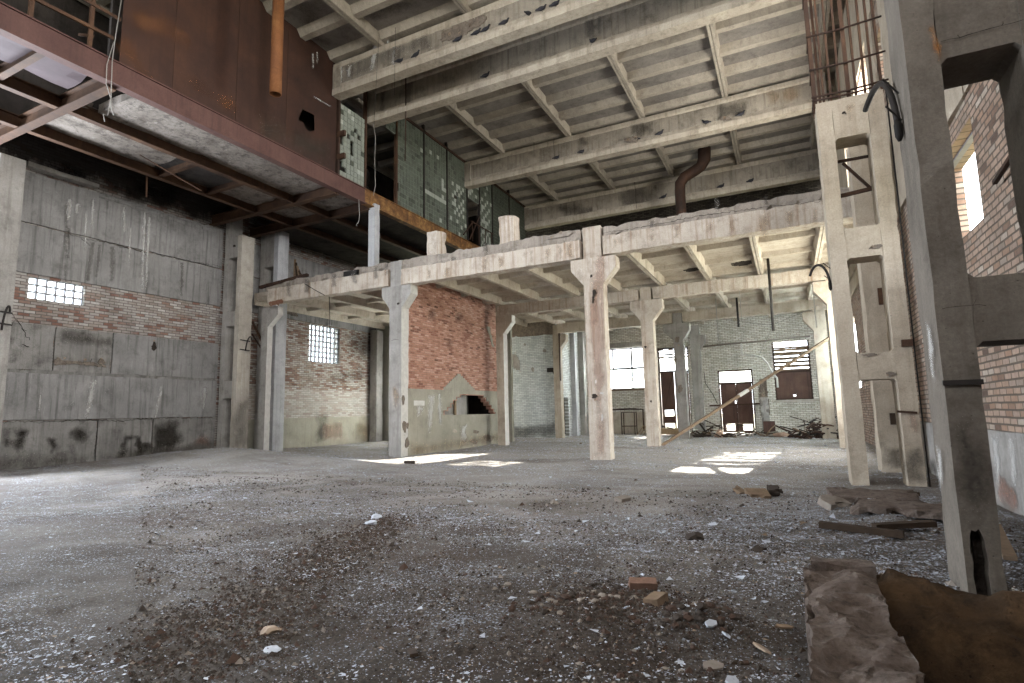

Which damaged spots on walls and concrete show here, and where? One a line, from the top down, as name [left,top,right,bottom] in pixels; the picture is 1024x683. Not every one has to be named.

damp [120,416,206,456]
spalling [970,530,987,596]